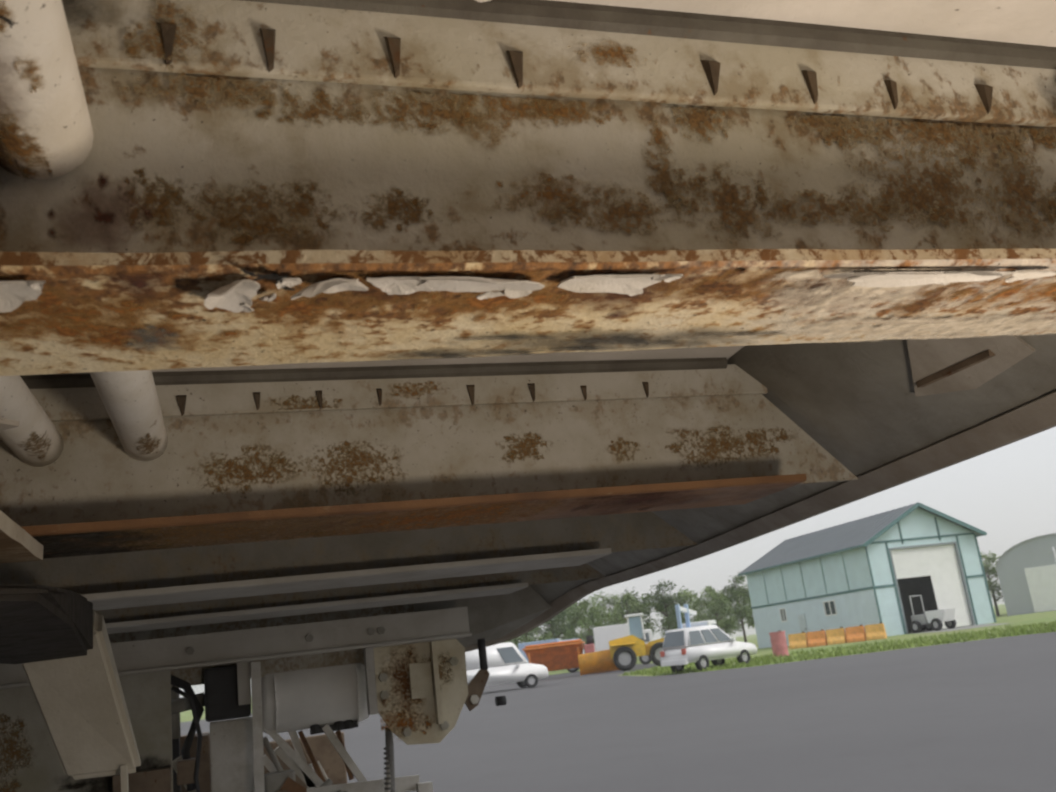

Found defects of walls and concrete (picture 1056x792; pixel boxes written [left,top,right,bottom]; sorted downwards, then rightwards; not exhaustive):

corrosion [246,91,613,146]
corrosion [0,114,52,179]
corrosion [496,106,1056,237]
corrosion [76,168,337,245]
corrosion [0,273,199,349]
peeling [204,277,544,313]
corrosion [255,272,566,327]
peeling [557,274,684,296]
corrosion [590,268,854,318]
corrosion [894,281,1056,314]
corrosion [200,441,404,494]
corrosion [665,426,788,467]